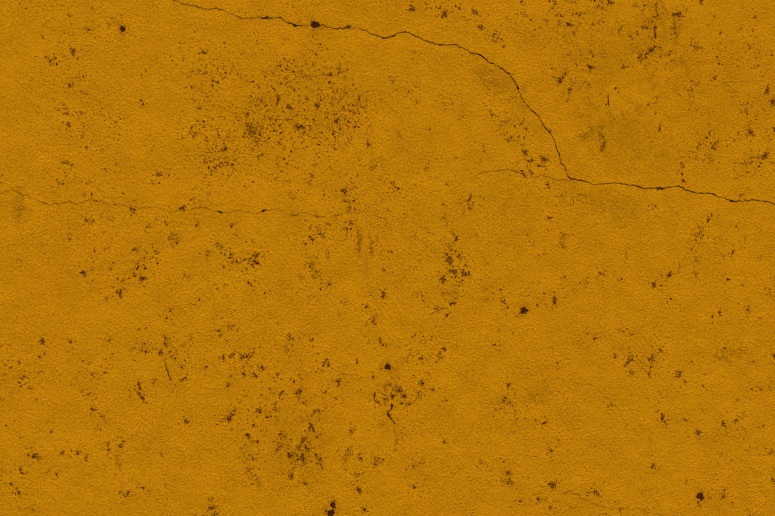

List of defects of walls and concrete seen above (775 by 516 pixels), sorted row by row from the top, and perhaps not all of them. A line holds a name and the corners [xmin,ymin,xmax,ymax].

crack [173,0,775,205]